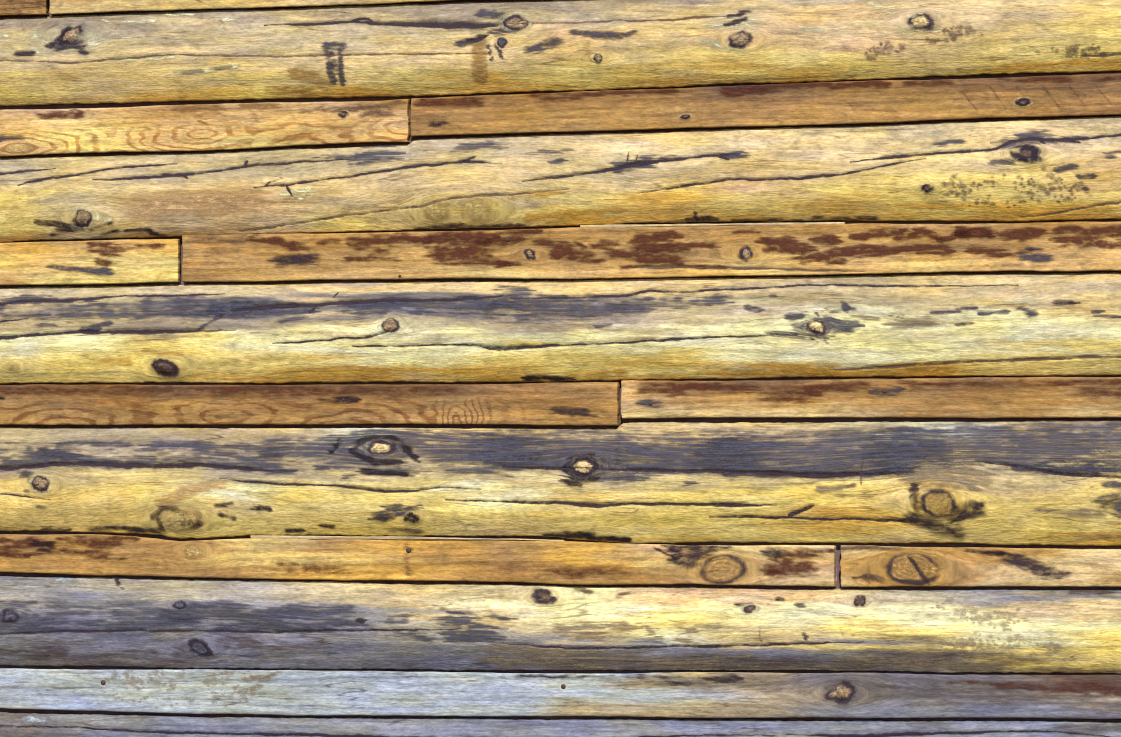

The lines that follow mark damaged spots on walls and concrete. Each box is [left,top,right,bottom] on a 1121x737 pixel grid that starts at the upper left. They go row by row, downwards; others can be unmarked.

crack [0,156,489,196]
crack [242,133,1121,231]
crack [0,265,1019,340]
crack [272,331,798,351]
crack [977,461,1121,478]
crack [0,461,913,522]
crack [907,556,930,586]